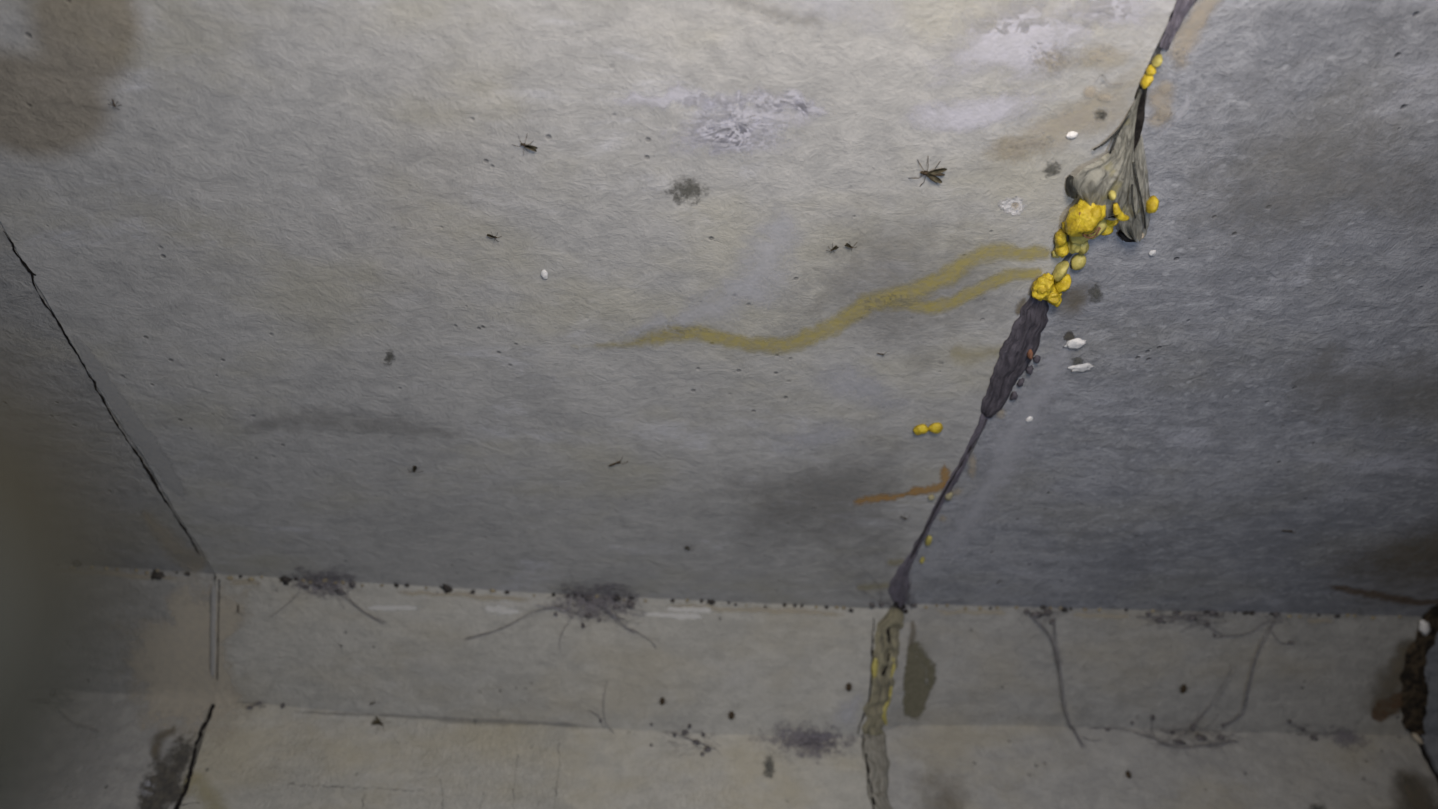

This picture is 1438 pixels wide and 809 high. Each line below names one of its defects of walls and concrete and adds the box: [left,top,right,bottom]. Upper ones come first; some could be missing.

water stain [638,220,1049,351]
crack [3,231,200,555]
crack [174,704,215,809]
crack [858,618,890,809]
crack [1418,735,1438,782]